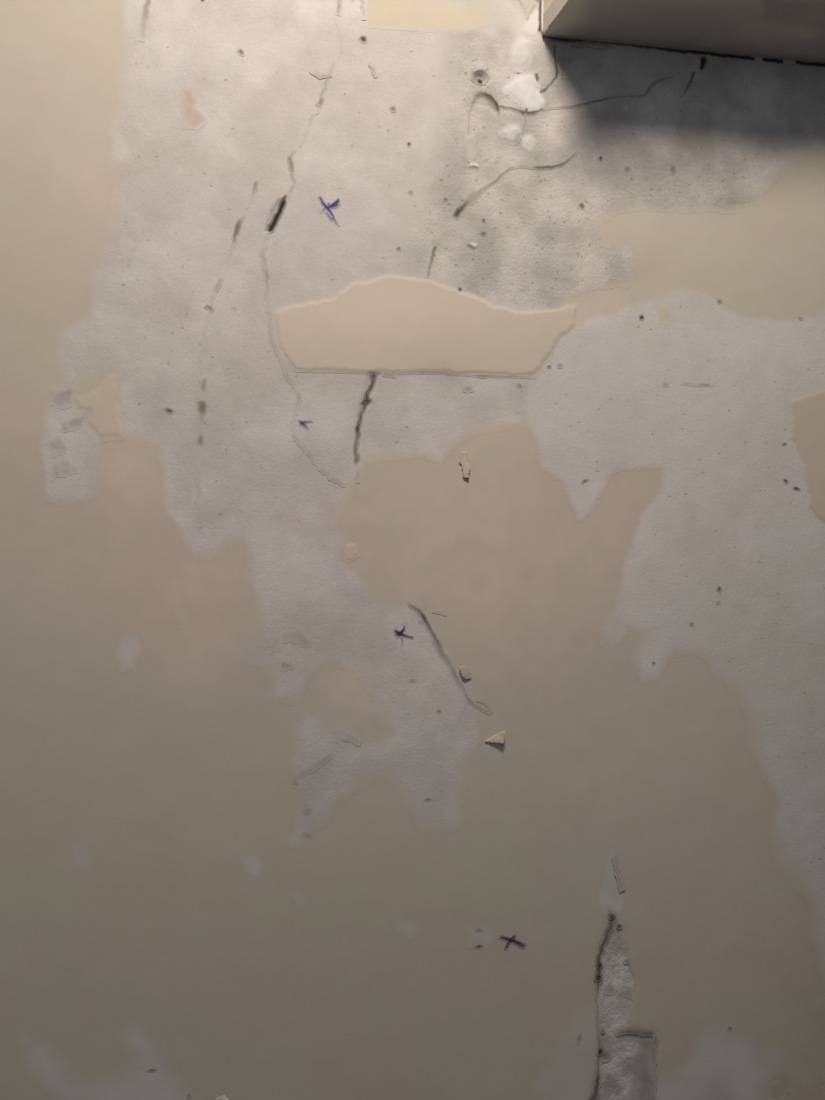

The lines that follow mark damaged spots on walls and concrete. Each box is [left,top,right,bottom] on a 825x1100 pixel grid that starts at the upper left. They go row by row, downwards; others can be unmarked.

crack [195,0,537,528]
peeling [53,0,825,850]
crack [405,599,493,715]
crack [452,0,825,219]
peeling [521,283,825,996]
spalling [587,909,659,1100]